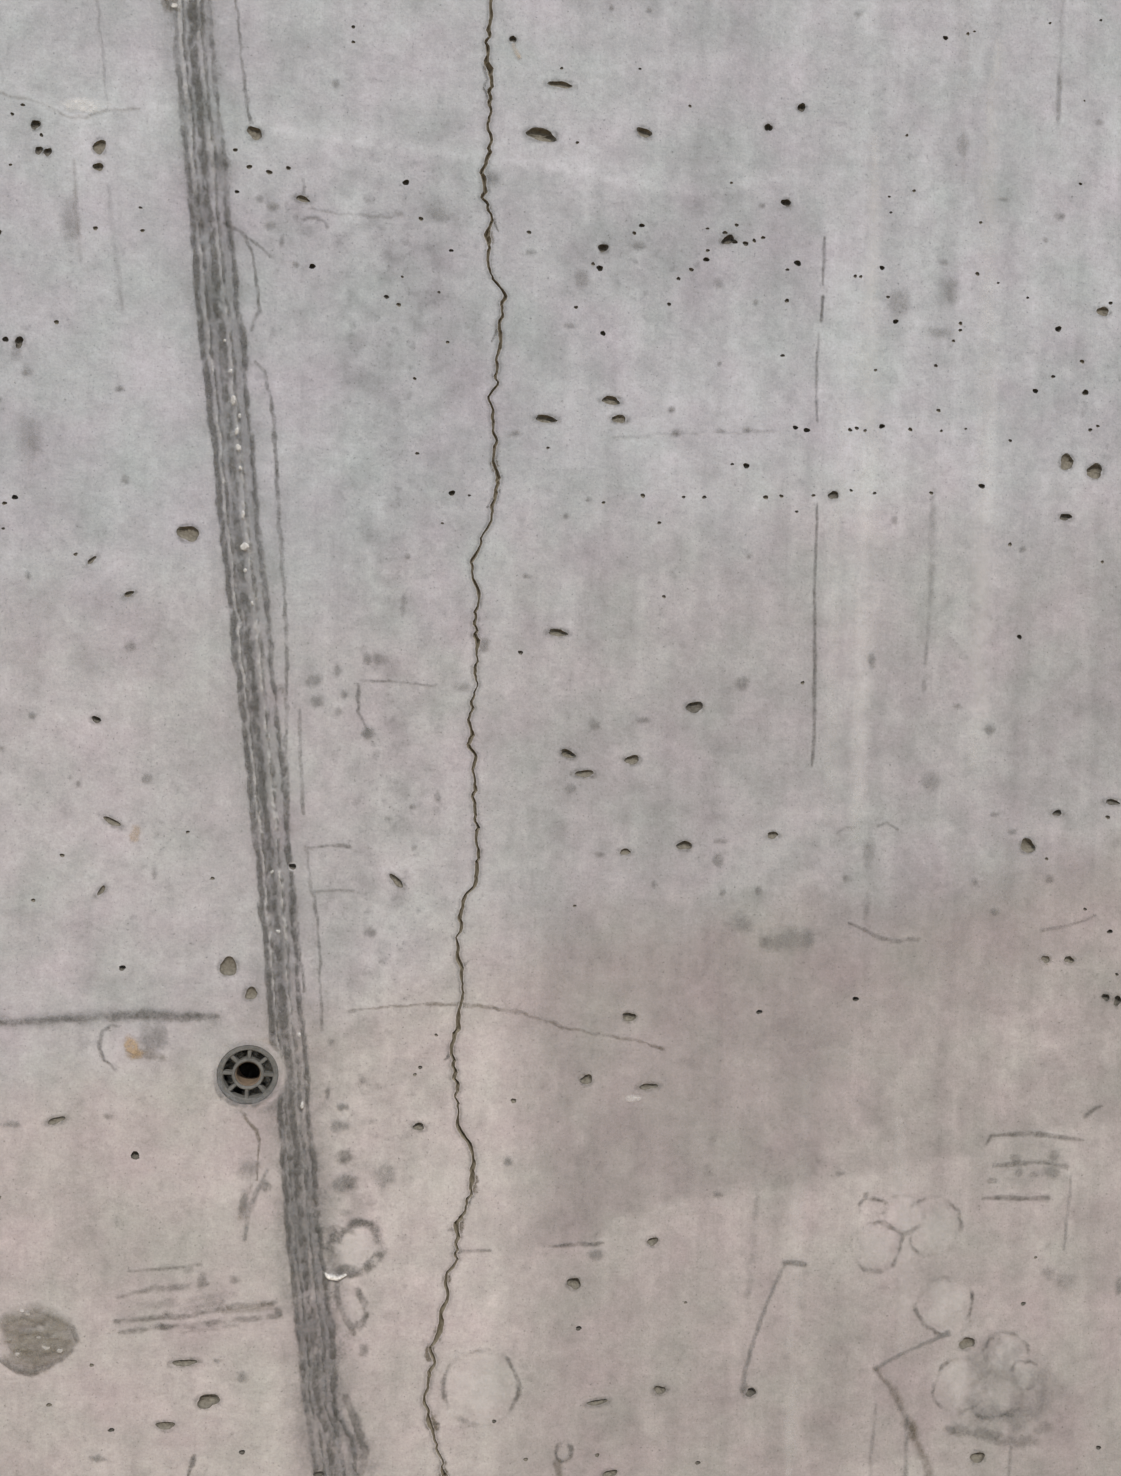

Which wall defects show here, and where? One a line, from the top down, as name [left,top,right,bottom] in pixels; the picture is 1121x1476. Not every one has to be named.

crack [422,0,508,1476]